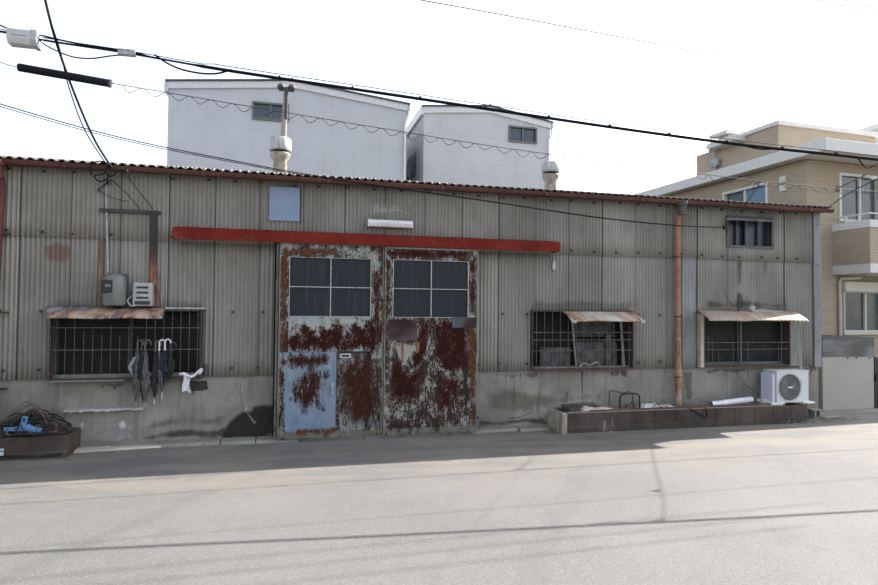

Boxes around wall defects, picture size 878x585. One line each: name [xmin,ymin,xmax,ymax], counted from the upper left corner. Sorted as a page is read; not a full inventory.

corrosion [278,246,337,343]
corrosion [372,248,476,340]
corrosion [280,359,335,436]
corrosion [394,342,420,365]
corrosion [430,328,476,424]